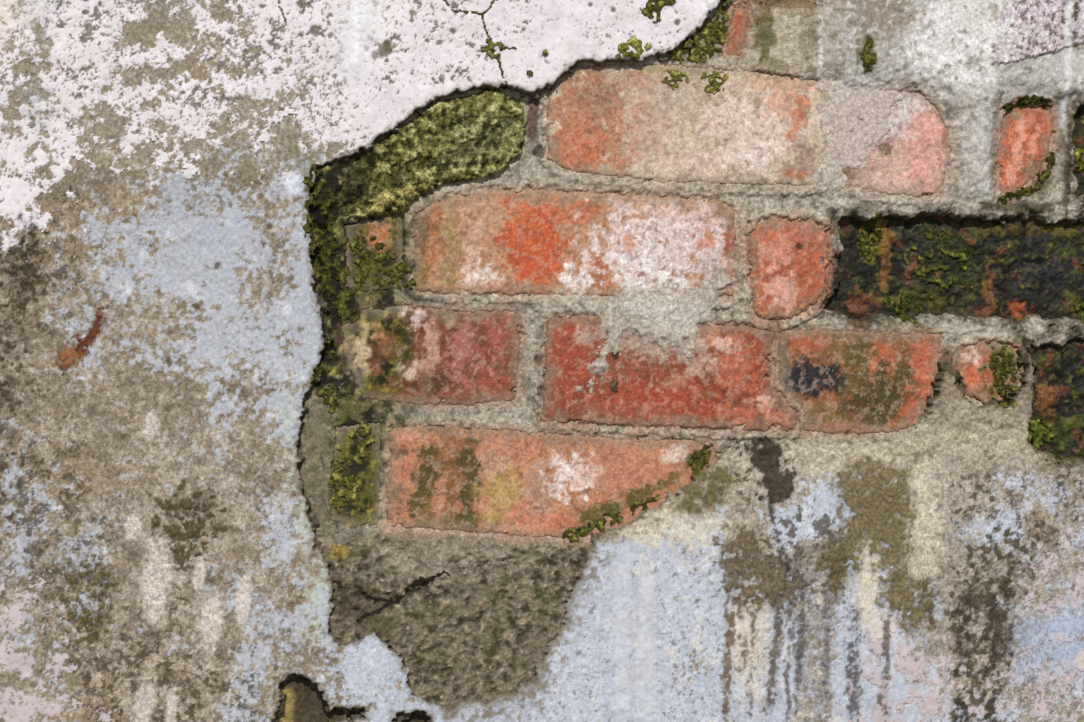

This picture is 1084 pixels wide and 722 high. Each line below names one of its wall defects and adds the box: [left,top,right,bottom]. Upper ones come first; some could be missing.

crack [278,0,305,25]
crack [442,0,517,89]
rust [55,305,109,375]
flaking render [297,0,1084,722]
damp [678,466,733,513]
damp [712,435,1059,722]
flaking render [272,674,363,722]